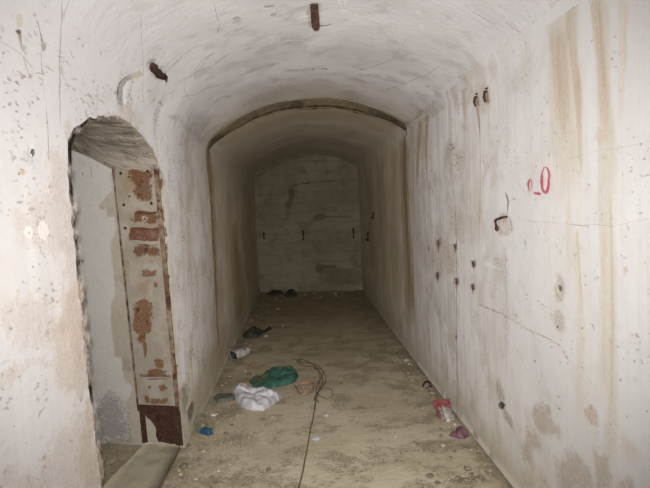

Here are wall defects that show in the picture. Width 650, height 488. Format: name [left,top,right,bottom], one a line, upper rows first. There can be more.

rust [310,3,319,30]
rust [129,209,168,261]
peeling [67,150,131,443]
rust [133,299,154,357]
rust [148,359,167,391]